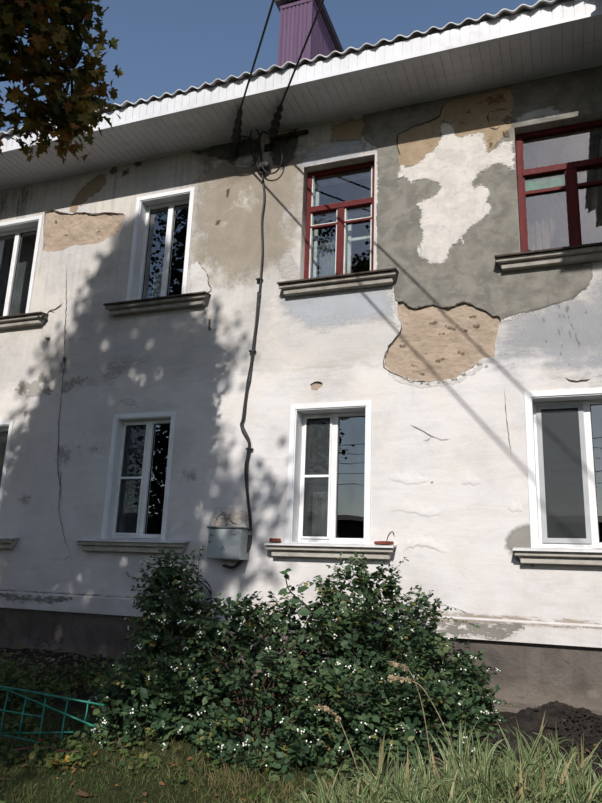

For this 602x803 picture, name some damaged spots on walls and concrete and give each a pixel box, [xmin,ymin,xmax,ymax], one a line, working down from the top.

peeling [396,88,514,166]
spalling [43,161,142,252]
spalling [383,285,521,389]
crack [45,265,69,558]
peeling [0,593,72,604]
peeling [430,620,525,640]